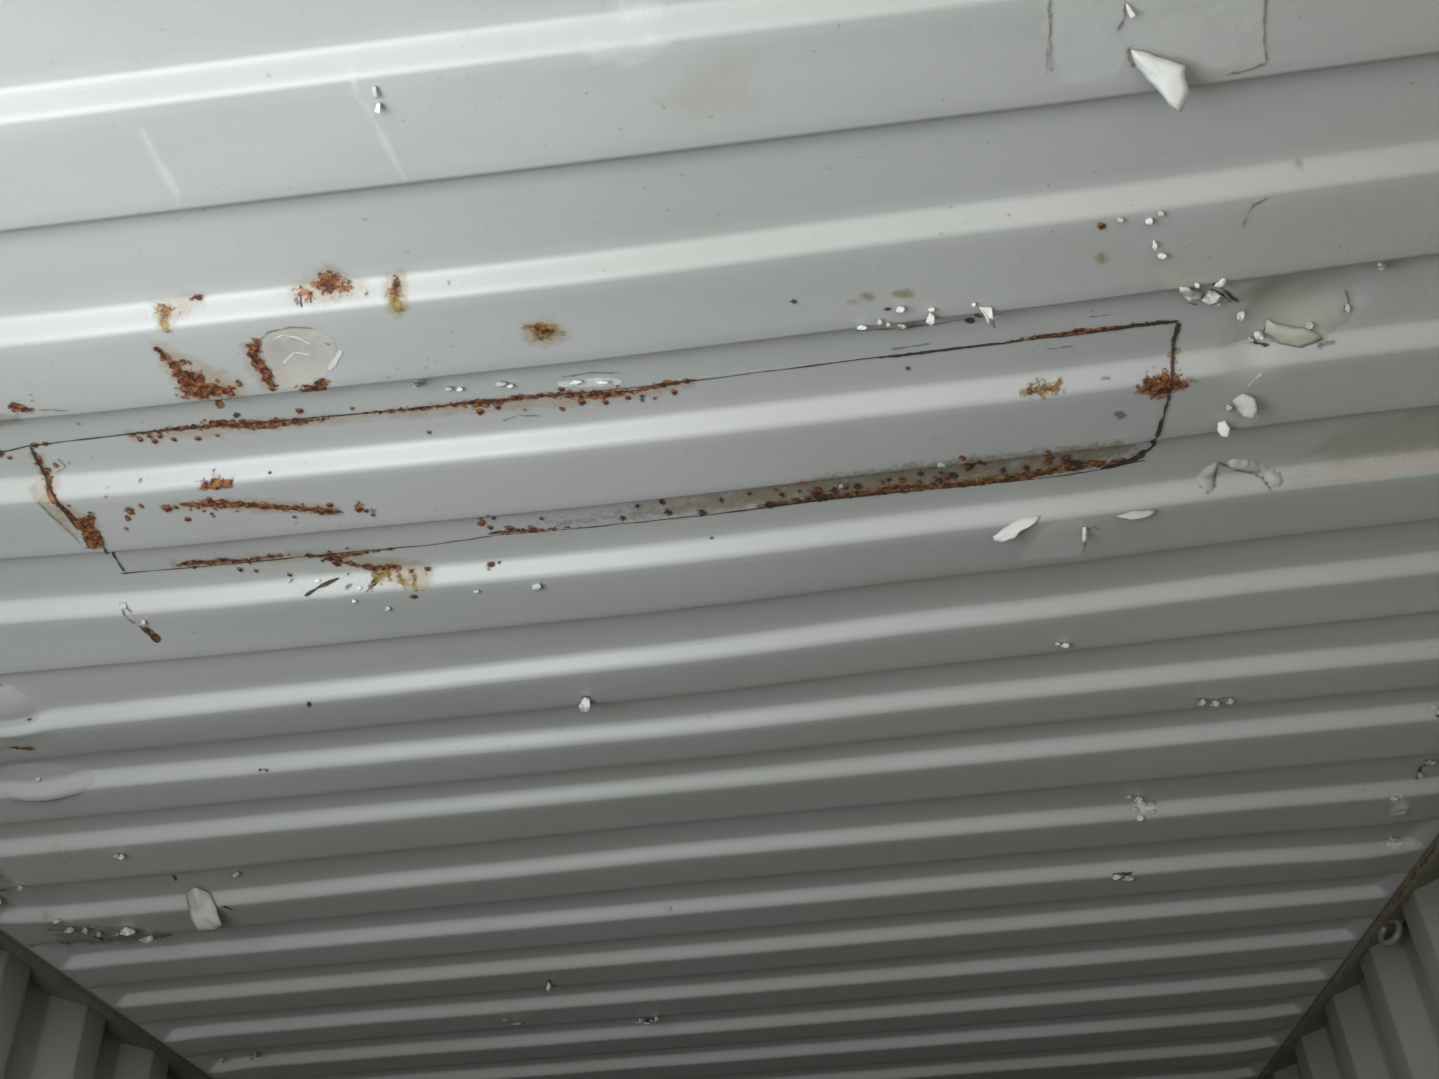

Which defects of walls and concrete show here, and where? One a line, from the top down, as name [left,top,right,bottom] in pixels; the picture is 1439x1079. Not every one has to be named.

peeling [1127,48,1190,112]
rust [295,270,368,304]
rust [387,275,405,312]
peeling [1180,278,1231,307]
rust [153,303,241,409]
rust [246,338,329,393]
peeling [1217,373,1262,438]
rust [161,469,375,522]
crack [0,315,1196,643]
peeling [993,516,1040,542]
rust [325,553,430,599]
peeling [172,876,232,932]